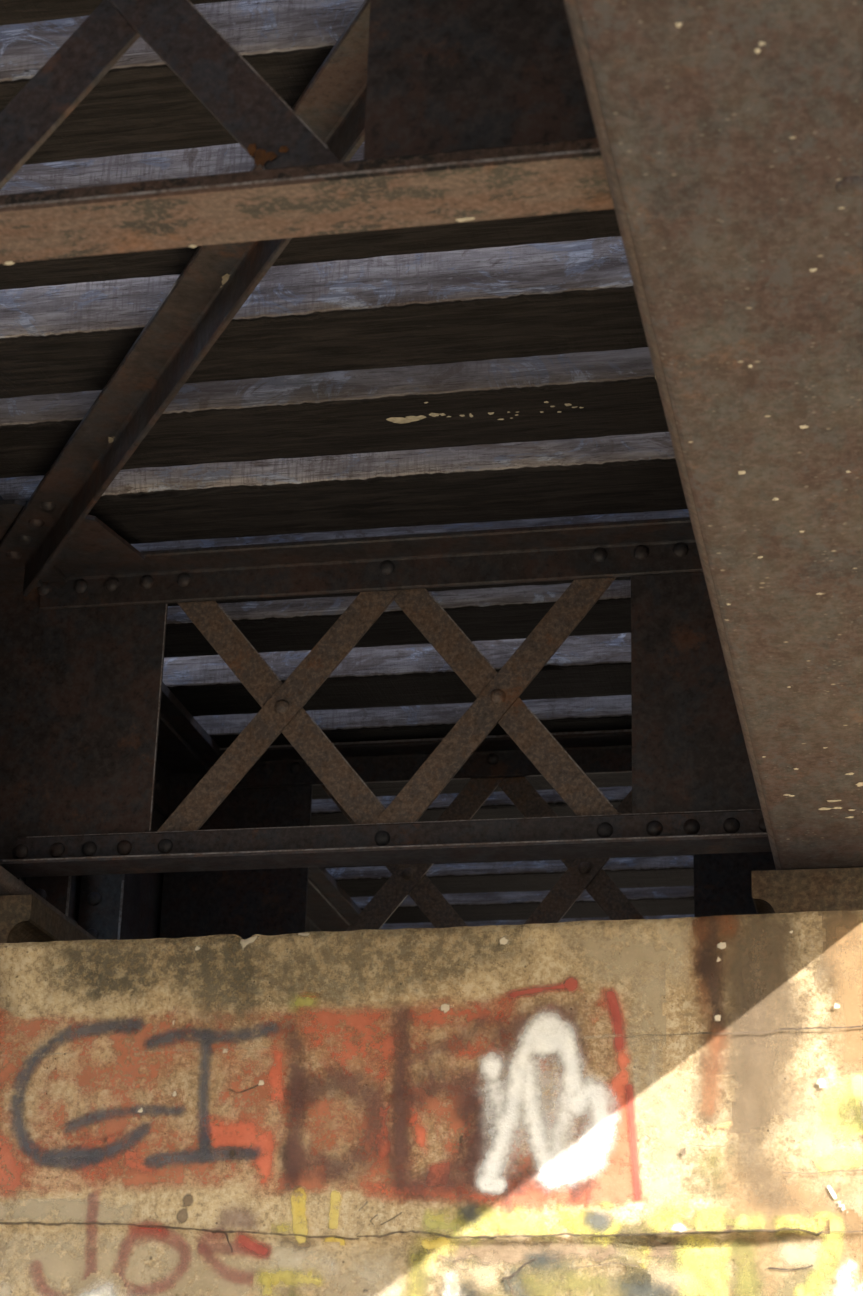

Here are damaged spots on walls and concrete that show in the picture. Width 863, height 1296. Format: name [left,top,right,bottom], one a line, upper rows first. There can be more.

rust [247,144,289,166]
rust [696,915,737,1133]
leakage [691,910,863,1296]
crack [0,1202,862,1294]
leakage [593,1231,702,1296]